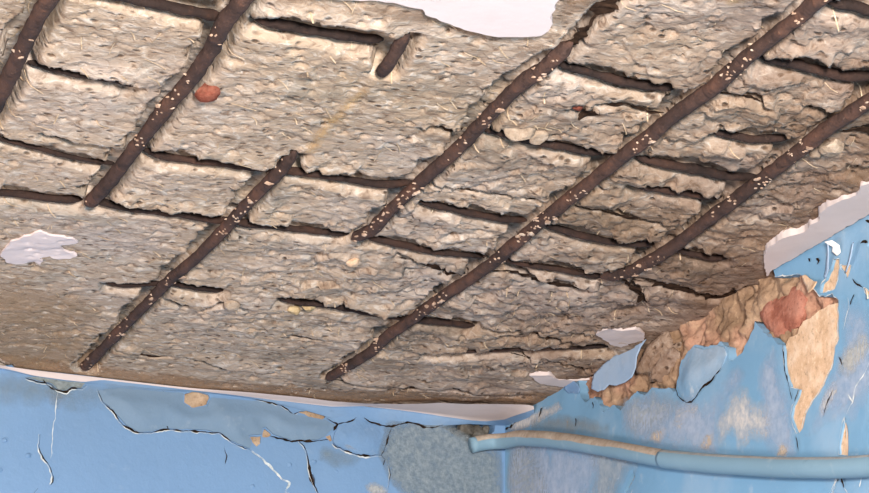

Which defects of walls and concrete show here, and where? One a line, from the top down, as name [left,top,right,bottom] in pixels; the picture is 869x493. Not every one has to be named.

spalling [169,0,230,12]
spalling [0,0,214,163]
peeling [820,240,854,293]
flaking render [586,275,839,434]
flaking render [184,385,209,408]
crack [823,364,869,417]
crack [27,378,441,493]
flaking render [250,430,270,446]